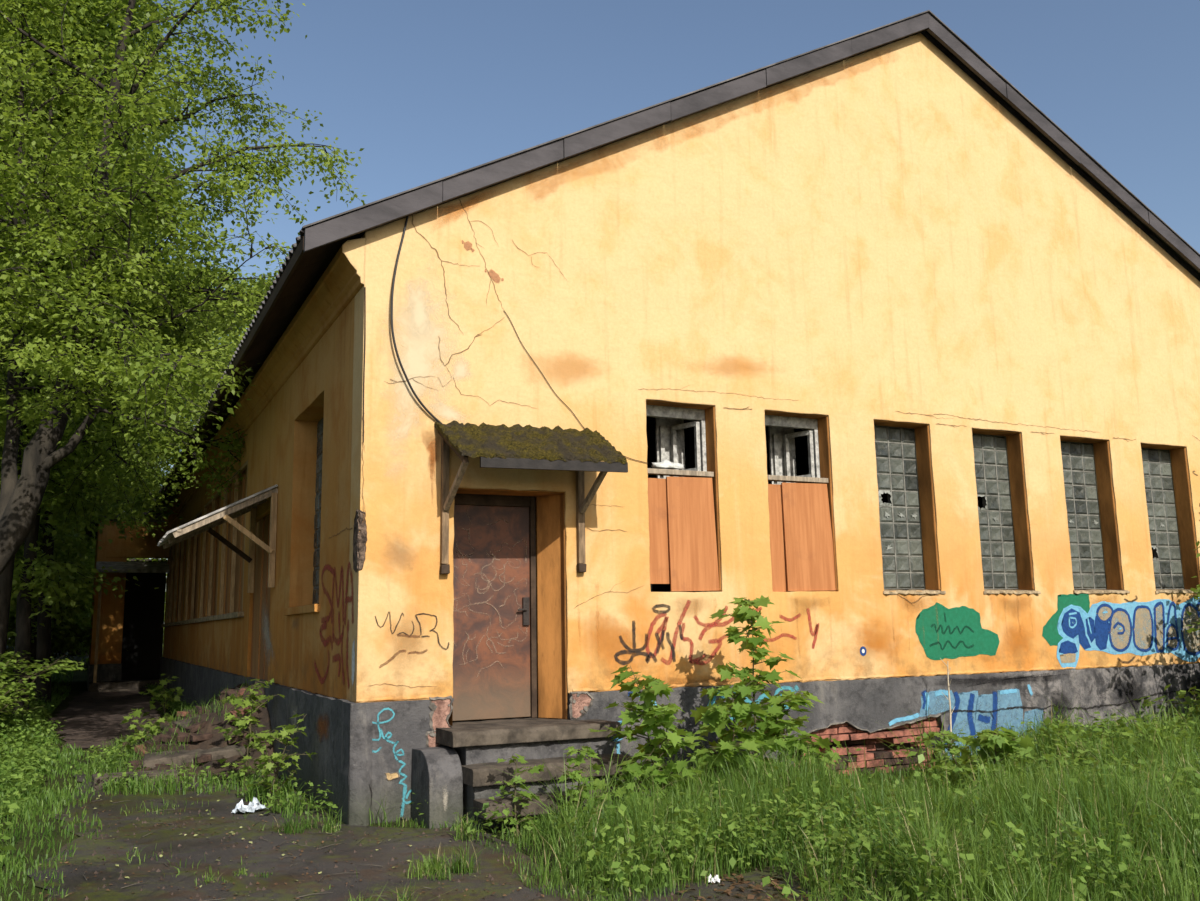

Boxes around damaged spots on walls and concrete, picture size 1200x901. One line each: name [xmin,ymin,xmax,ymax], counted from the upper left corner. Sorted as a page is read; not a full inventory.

crack [387,214,566,408]
flaking render [794,713,944,775]